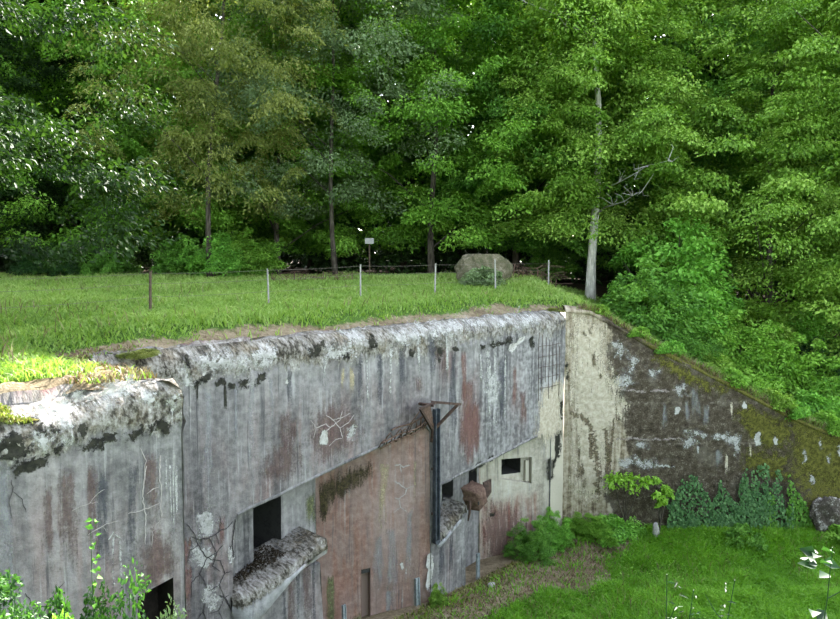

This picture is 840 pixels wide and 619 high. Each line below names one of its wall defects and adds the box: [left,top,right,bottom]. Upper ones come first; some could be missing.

crack [311,411,354,446]
leakage [341,349,405,400]
leakage [417,336,436,380]
leakage [446,336,457,426]
corrosion [458,353,480,462]
leakage [479,351,507,428]
leakage [165,459,178,523]
crack [186,517,236,619]